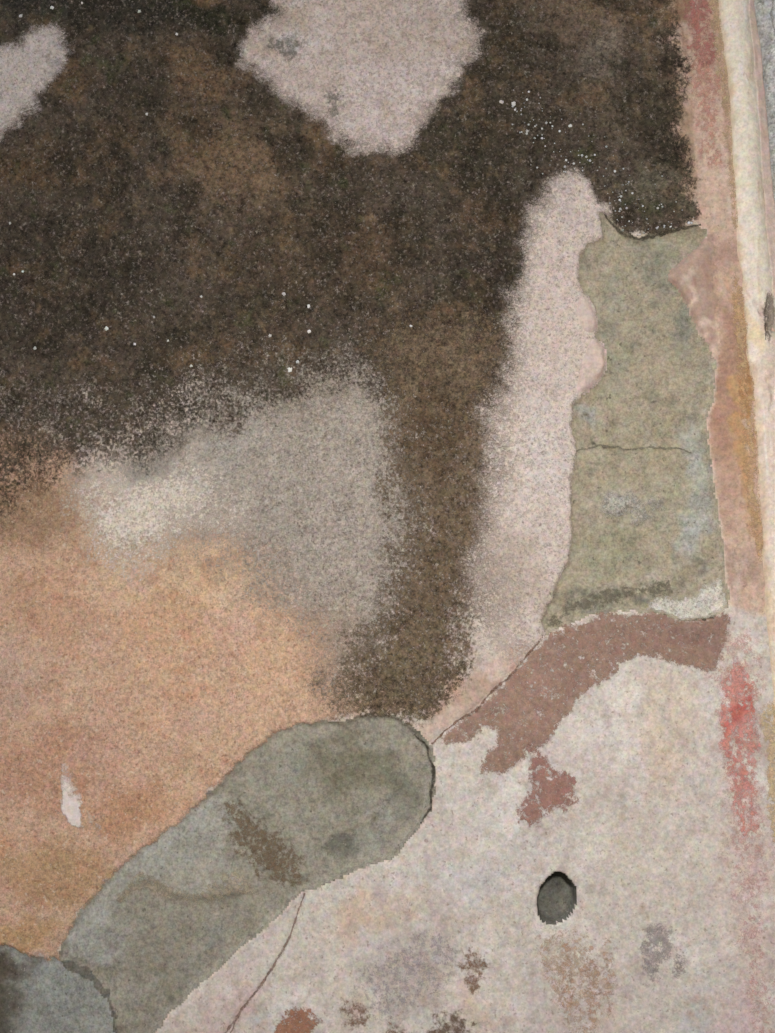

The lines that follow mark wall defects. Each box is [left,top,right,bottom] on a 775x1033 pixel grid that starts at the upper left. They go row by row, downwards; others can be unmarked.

leakage [0,0,727,726]
spalling [541,212,730,635]
spalling [0,713,436,1033]
crack [225,893,305,1033]